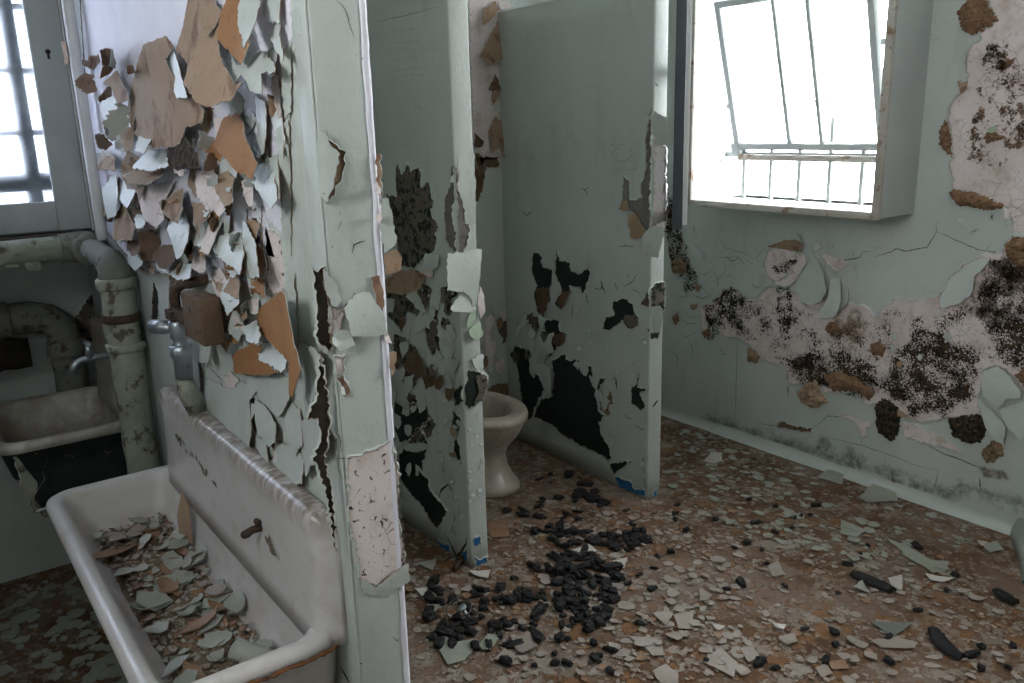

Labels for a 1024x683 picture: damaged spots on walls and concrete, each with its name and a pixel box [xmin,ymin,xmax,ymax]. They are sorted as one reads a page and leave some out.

peeling [13,456,50,518]
peeling [61,0,514,611]